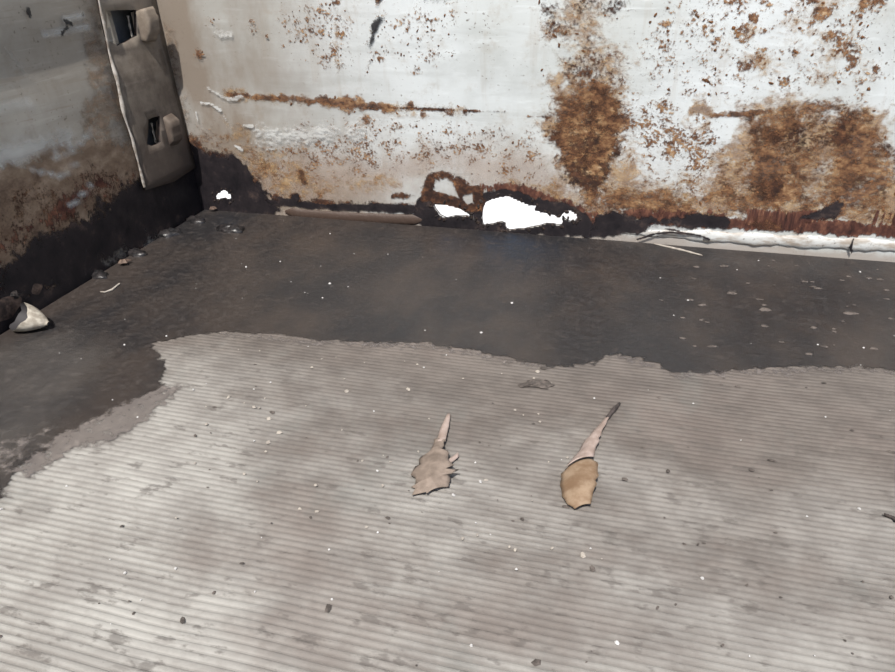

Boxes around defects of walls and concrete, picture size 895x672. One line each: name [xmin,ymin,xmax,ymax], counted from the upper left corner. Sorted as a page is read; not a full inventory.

peeling [430,193,582,233]
corrosion [192,0,895,238]
water stain [0,210,895,498]